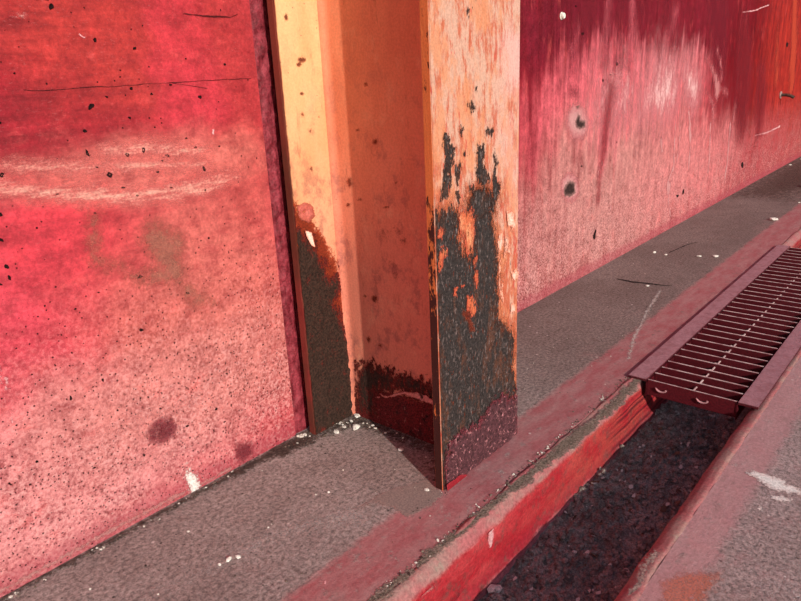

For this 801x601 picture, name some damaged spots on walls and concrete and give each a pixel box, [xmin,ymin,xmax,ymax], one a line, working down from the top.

crack [28,78,251,91]
leakage [592,0,727,216]
rust [293,181,517,459]